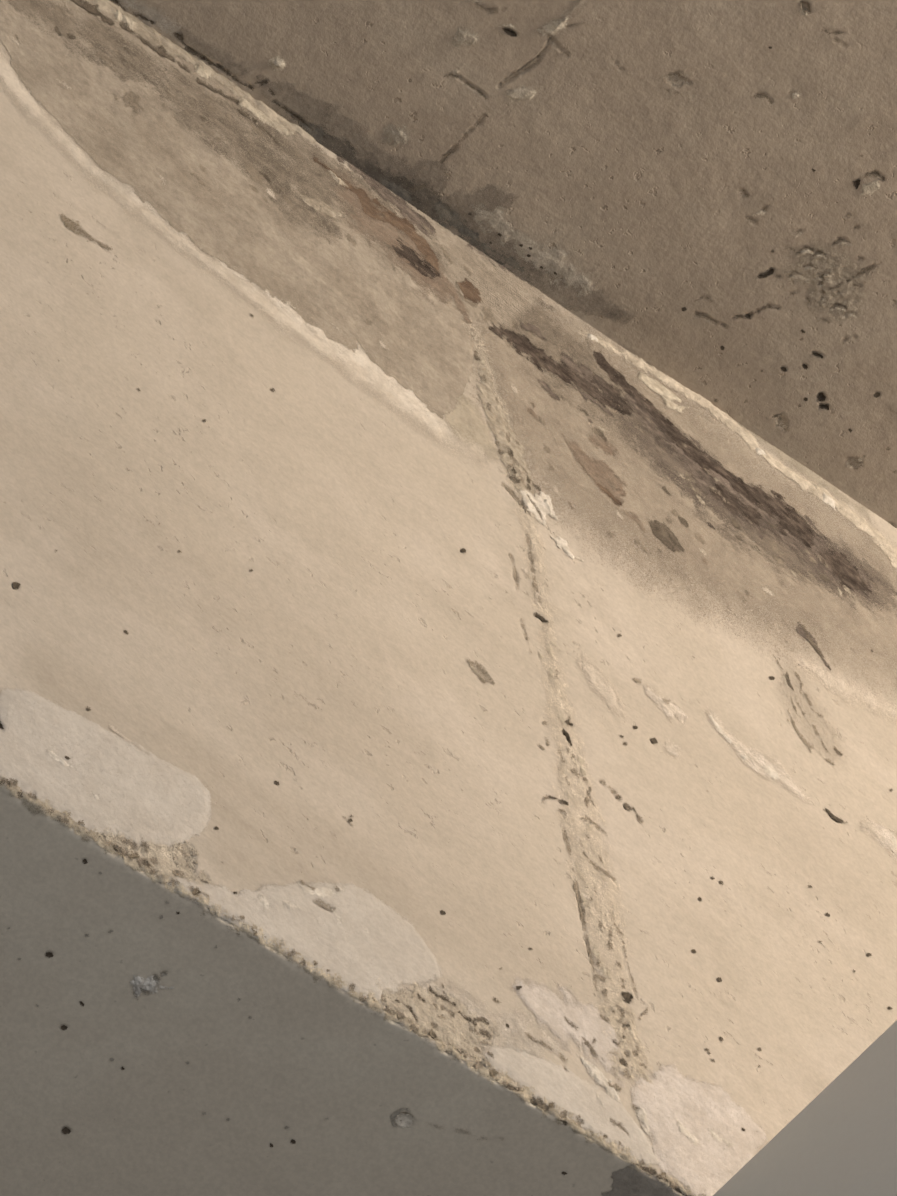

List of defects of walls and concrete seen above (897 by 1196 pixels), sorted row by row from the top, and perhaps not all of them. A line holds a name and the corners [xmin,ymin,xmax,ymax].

spalling [0,776,706,1196]
water stain [0,0,897,707]
crack [463,318,648,1054]